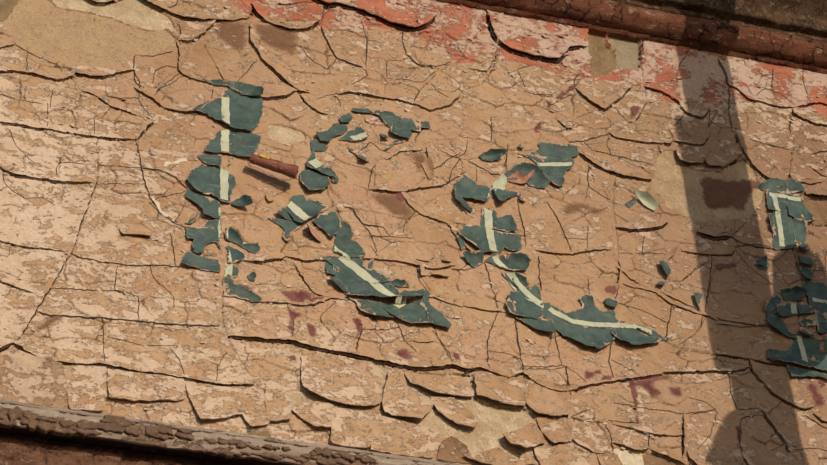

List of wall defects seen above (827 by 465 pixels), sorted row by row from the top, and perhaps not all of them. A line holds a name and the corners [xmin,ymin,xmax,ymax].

flaking render [0,0,175,67]
peeling [181,73,452,328]
crack [0,0,786,387]
crack [227,140,827,465]
peeling [454,142,681,348]
flaking render [588,33,640,76]
flaking render [652,151,827,379]
crack [717,58,827,197]
flaking render [374,364,535,460]
flaking render [613,448,676,465]